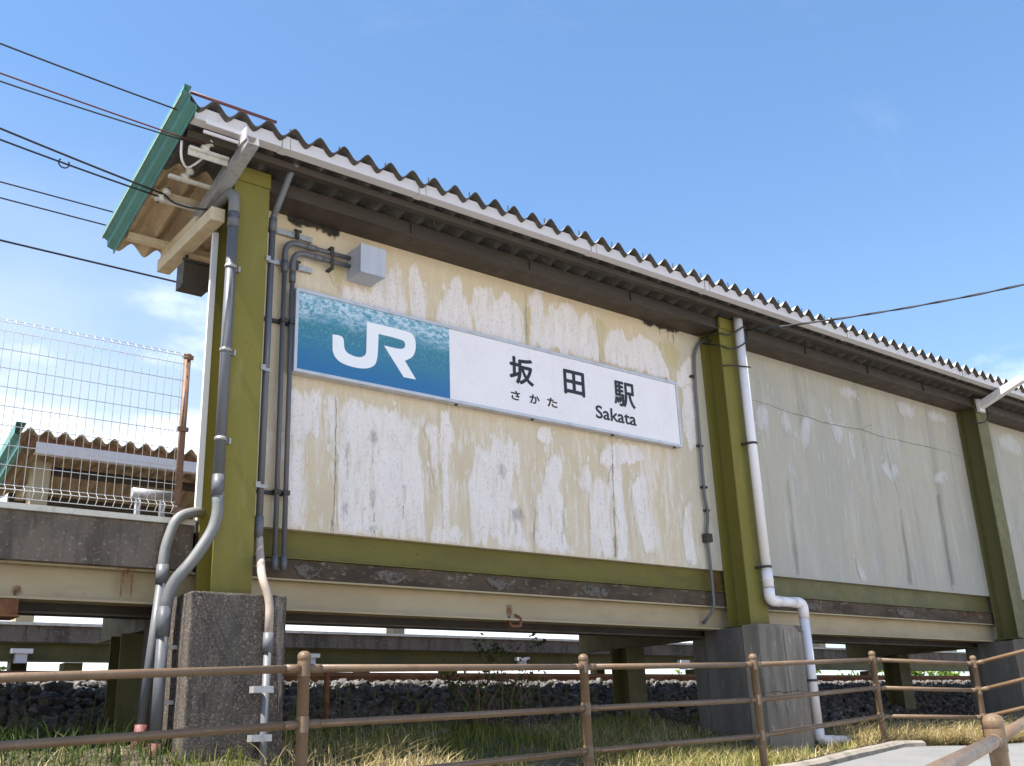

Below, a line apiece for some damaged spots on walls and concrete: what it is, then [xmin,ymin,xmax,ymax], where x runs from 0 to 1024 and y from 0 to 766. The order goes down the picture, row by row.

peeling [340,261,698,452]
peeling [281,386,575,556]
peeling [577,438,658,561]
peeling [680,501,698,567]
crack [753,400,961,500]